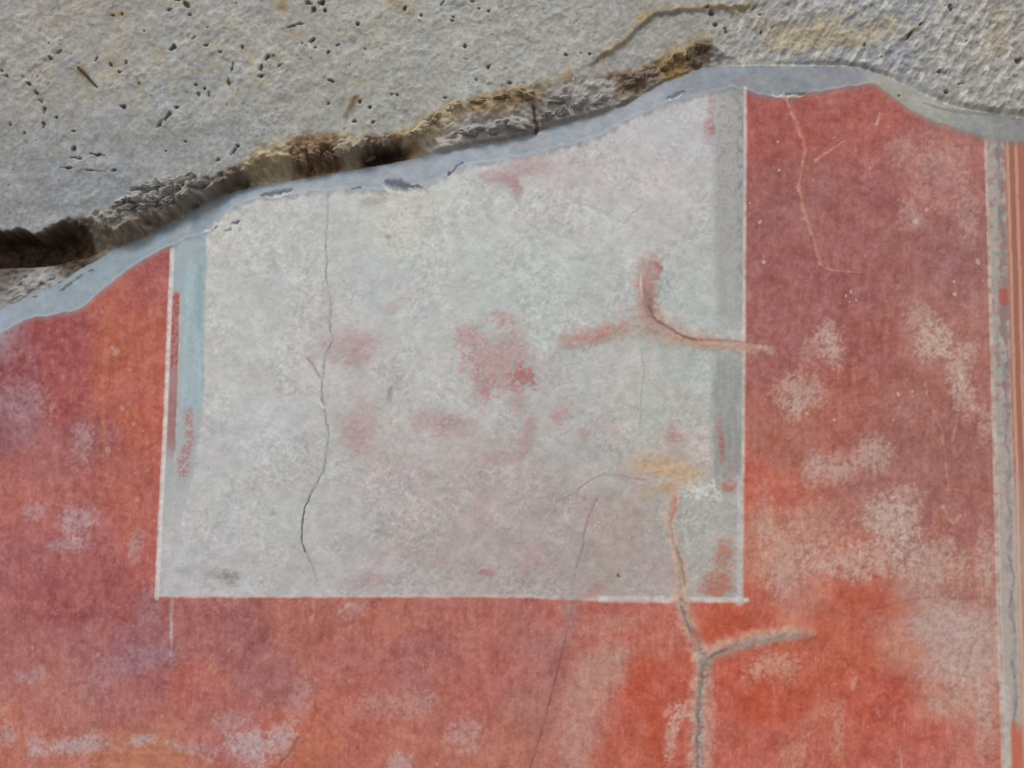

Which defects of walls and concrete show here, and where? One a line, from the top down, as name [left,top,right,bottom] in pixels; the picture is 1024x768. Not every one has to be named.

spalling [26,76,58,129]
spalling [60,146,117,173]
flaking render [7,171,210,304]
spalling [286,0,327,29]
spalling [216,5,728,201]
crack [780,90,863,274]
crack [300,195,335,582]
crack [551,245,778,437]
crack [555,472,802,768]